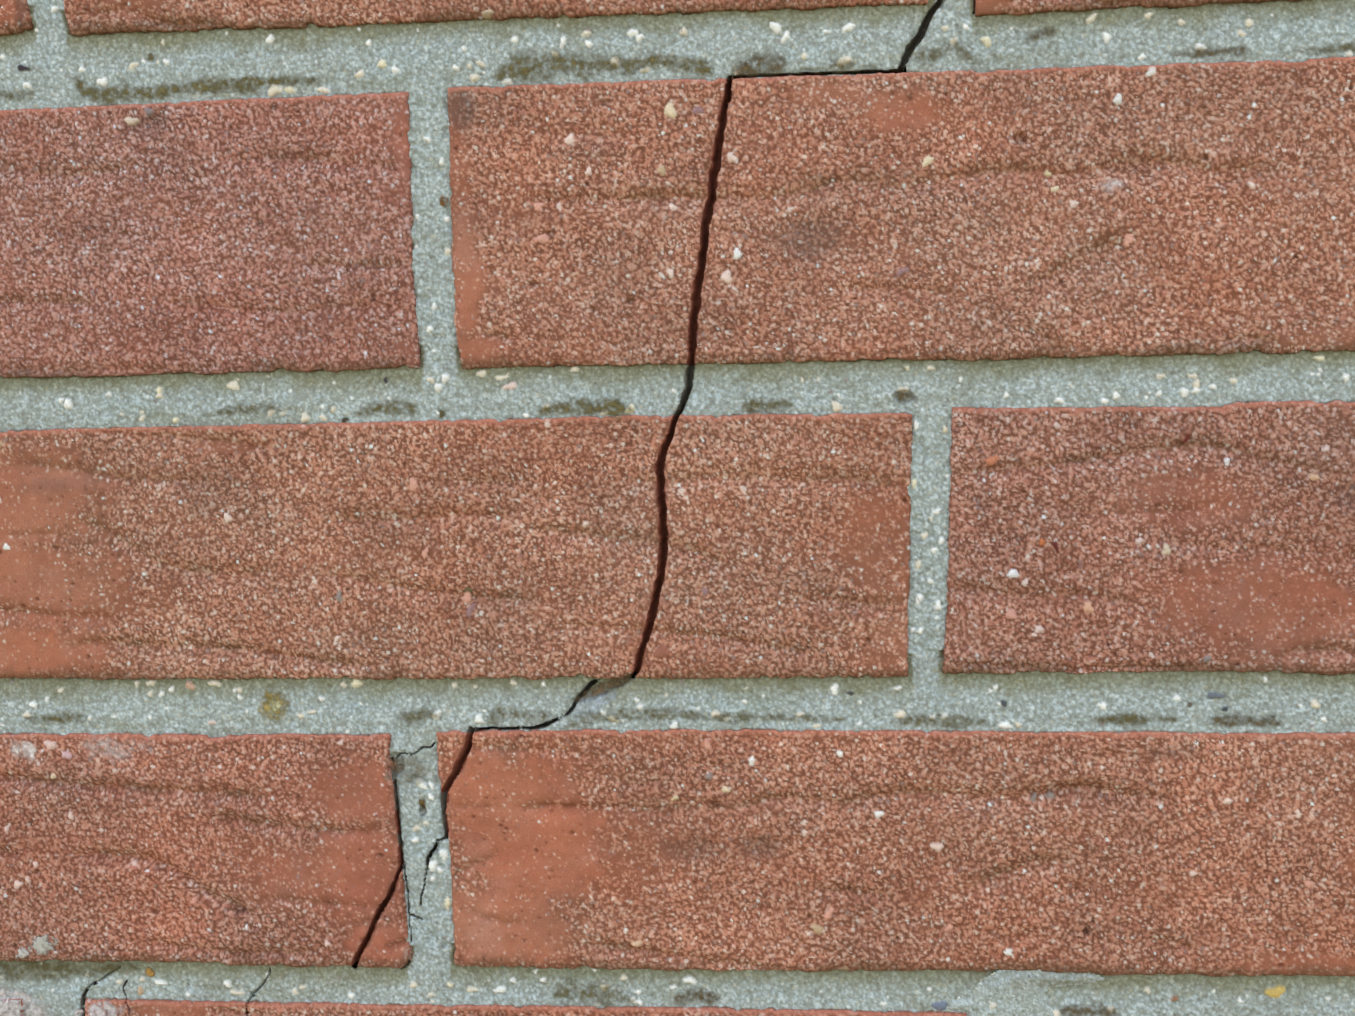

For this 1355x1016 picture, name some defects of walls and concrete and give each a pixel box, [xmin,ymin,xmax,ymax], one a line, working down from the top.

crack [631,0,975,677]
crack [351,679,598,969]